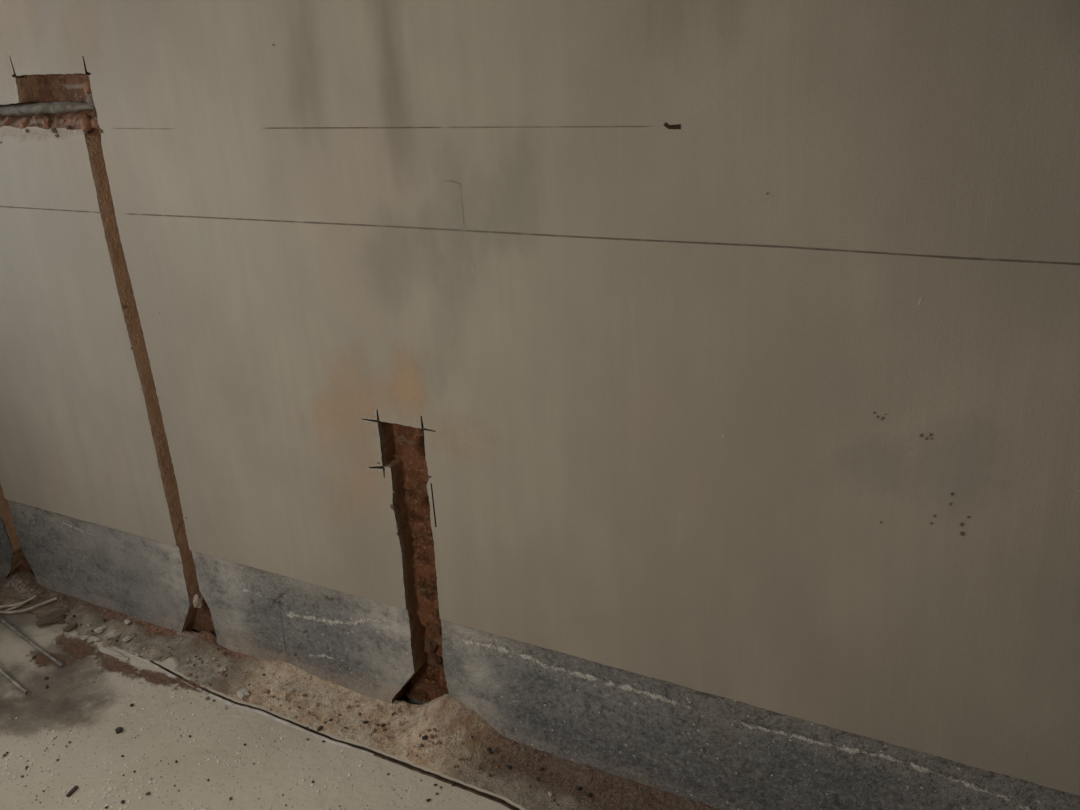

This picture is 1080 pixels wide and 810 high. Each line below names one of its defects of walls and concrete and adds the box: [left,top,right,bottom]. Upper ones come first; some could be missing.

flaking render [0,73,101,136]
flaking render [191,551,216,636]
flaking render [392,423,449,702]